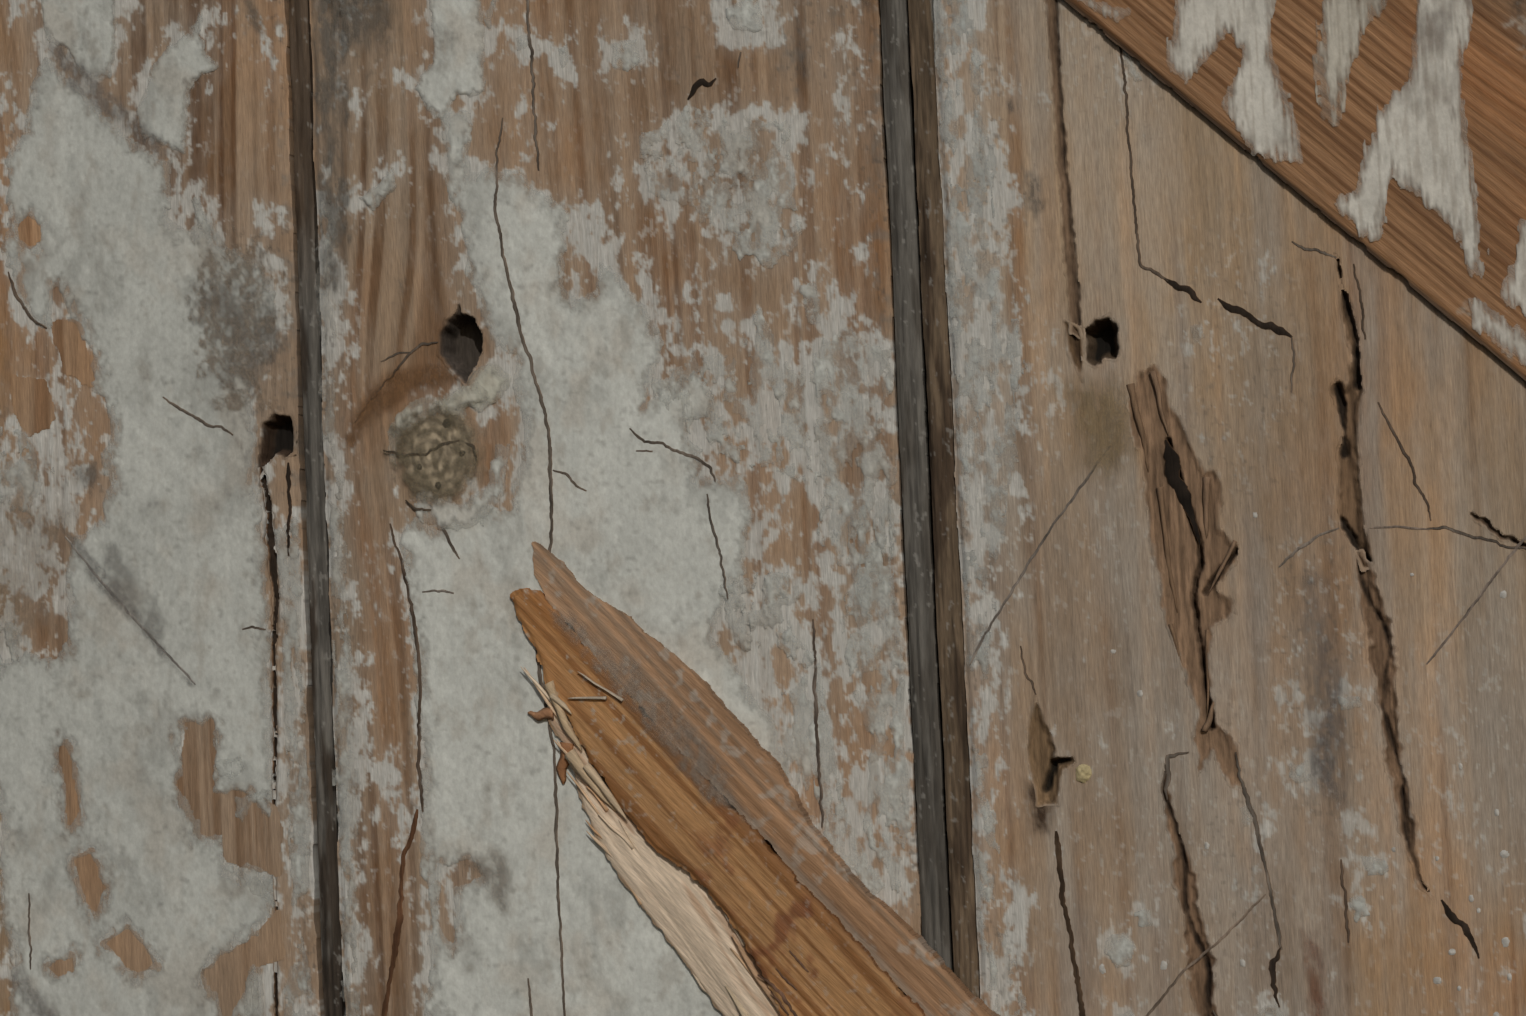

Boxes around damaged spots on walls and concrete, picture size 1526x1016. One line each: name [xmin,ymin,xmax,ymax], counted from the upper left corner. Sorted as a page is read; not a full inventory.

peeling [1170,0,1298,163]
peeling [1315,0,1381,124]
peeling [1339,0,1485,275]
crack [493,0,587,553]
peeling [1472,224,1526,361]
peeling [0,0,309,1016]
crack [242,462,292,809]
peeling [390,0,912,1016]
crack [1119,47,1526,959]
crack [1054,831,1085,1016]
crack [1158,752,1221,1016]
crack [1235,752,1283,1008]